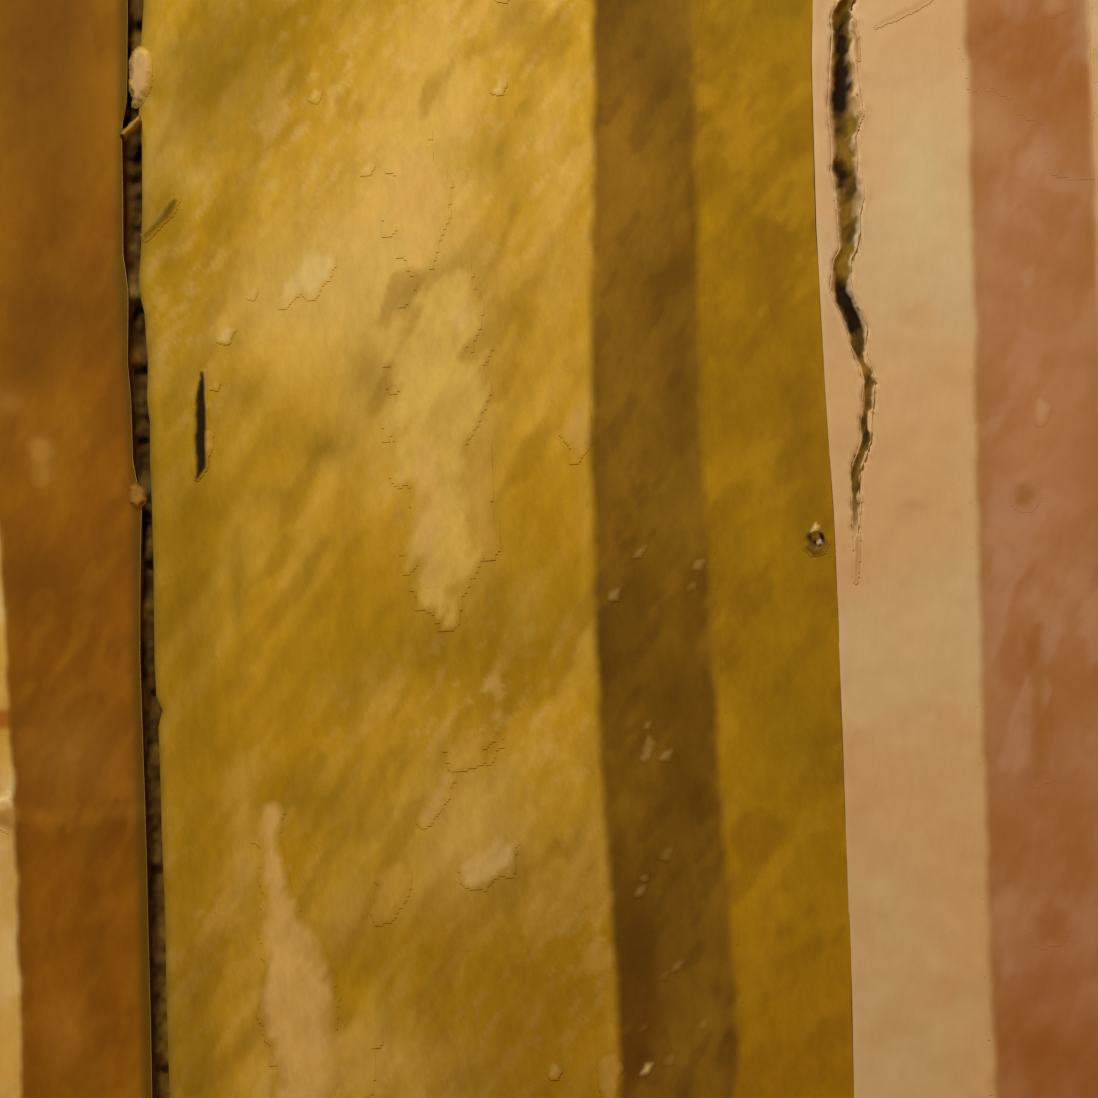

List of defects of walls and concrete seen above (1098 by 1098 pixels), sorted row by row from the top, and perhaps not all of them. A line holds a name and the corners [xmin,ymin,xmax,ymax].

crack [120,0,180,1098]
crack [827,0,932,584]